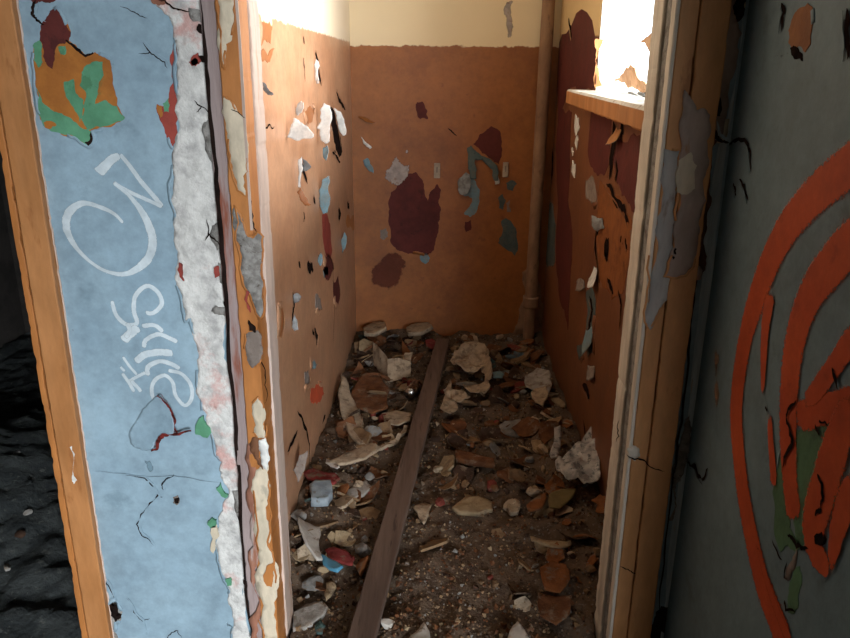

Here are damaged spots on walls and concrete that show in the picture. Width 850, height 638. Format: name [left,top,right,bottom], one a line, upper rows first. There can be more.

peeling [30,0,125,149]
peeling [287,101,347,161]
peeling [297,157,354,310]
peeling [380,172,441,264]
peeling [458,126,518,256]
peeling [546,9,640,381]
peeling [643,0,746,330]
crack [715,122,751,204]
spalling [151,0,279,638]
crack [102,471,209,545]
crack [616,280,708,635]
peeling [772,424,829,614]